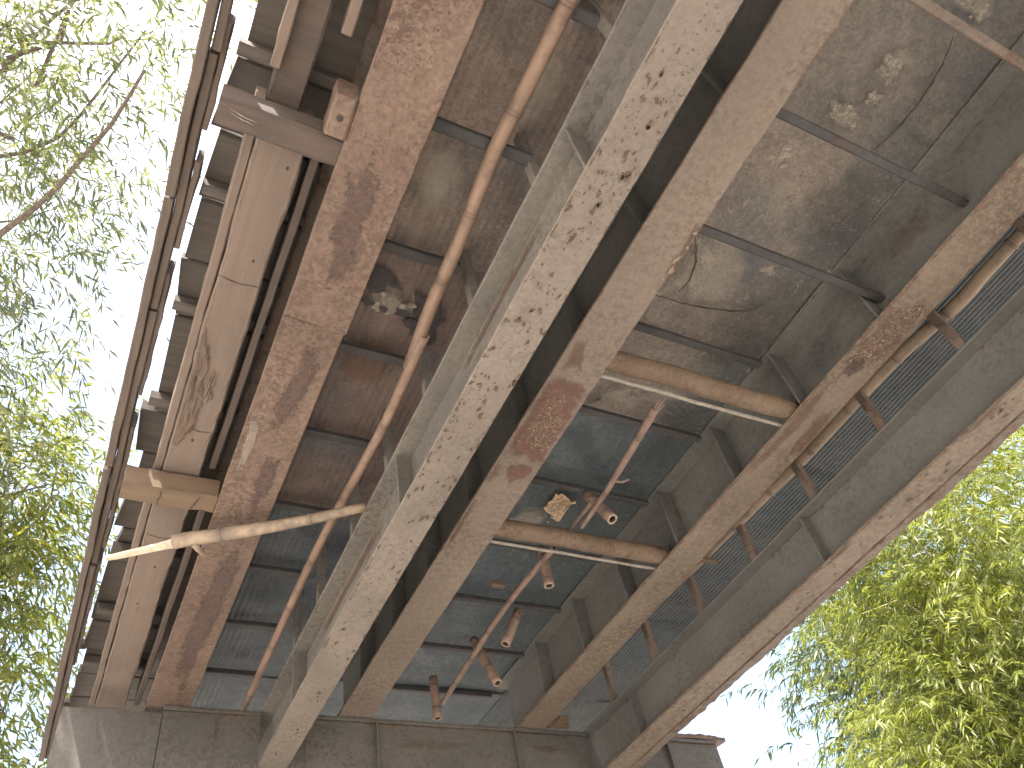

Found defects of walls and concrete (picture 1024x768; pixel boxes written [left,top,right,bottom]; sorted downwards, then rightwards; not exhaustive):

crack [874,38,953,150]
peeling [361,291,417,331]
crack [655,237,763,312]
corrosion [507,379,585,482]